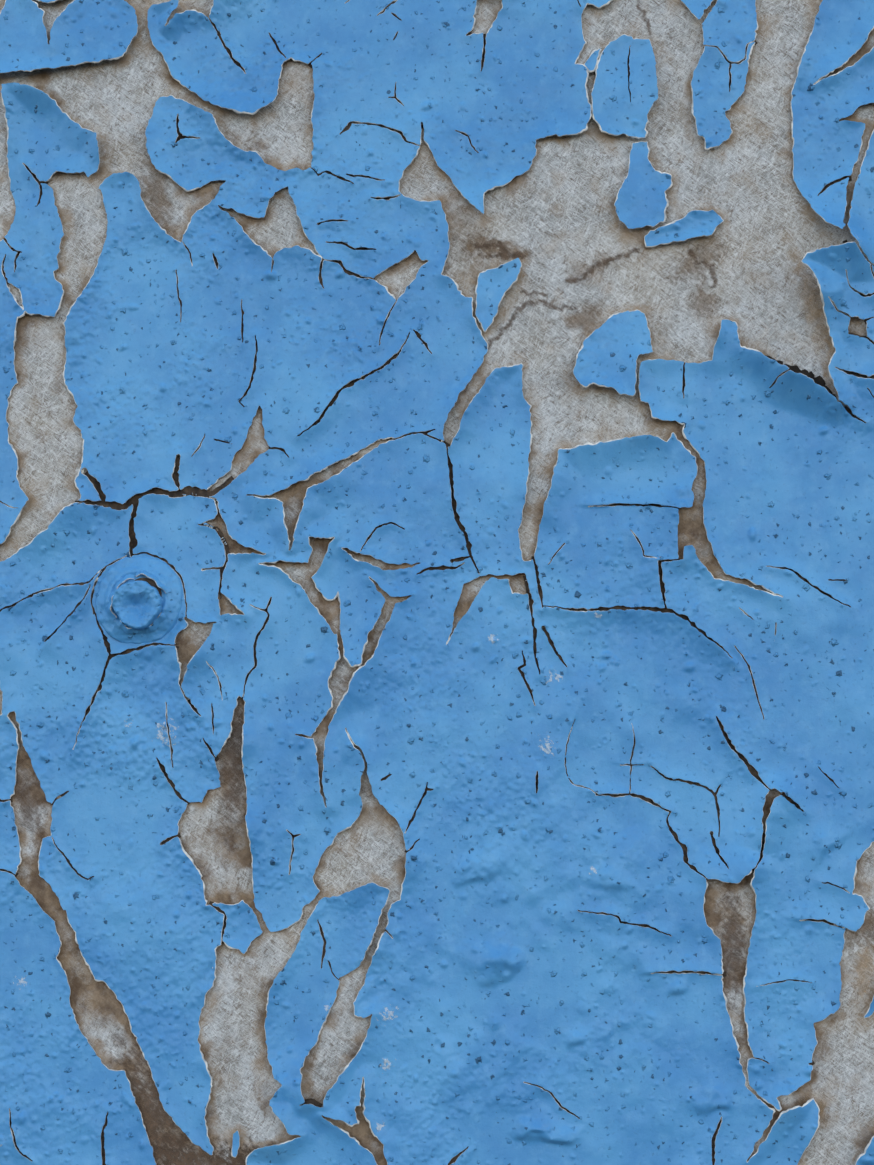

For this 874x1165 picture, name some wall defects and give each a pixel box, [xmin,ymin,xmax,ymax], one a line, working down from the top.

crack [0,436,234,735]
peeling [0,0,324,561]
peeling [0,690,406,1165]
peeling [175,594,244,701]
crack [157,597,272,805]
peeling [198,406,420,807]
crack [269,300,410,458]
crack [396,429,479,574]
peeling [400,0,874,636]
crack [518,503,764,719]
crack [536,720,765,880]
peeling [704,842,874,1165]